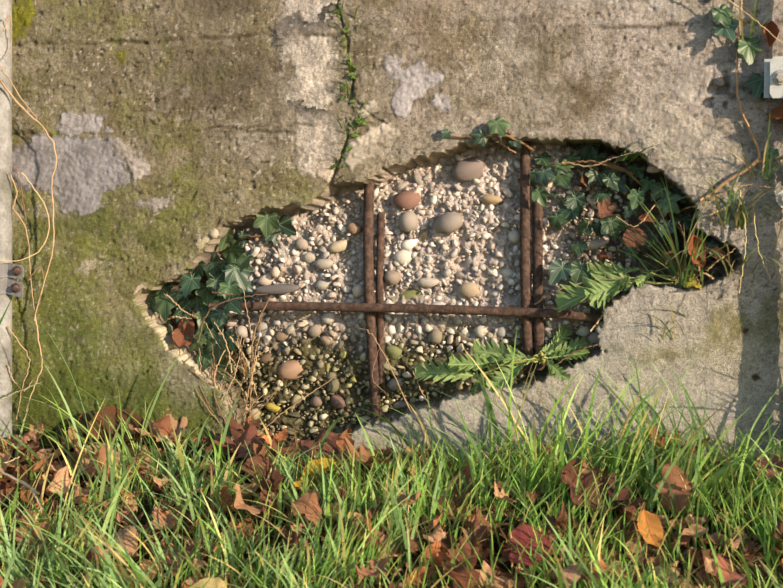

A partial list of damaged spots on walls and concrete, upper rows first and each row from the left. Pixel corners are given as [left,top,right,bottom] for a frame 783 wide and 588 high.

peeling [12,111,151,216]
damp [275,0,342,178]
peeling [345,53,452,172]
damp [67,259,97,276]
spalling [133,103,745,446]